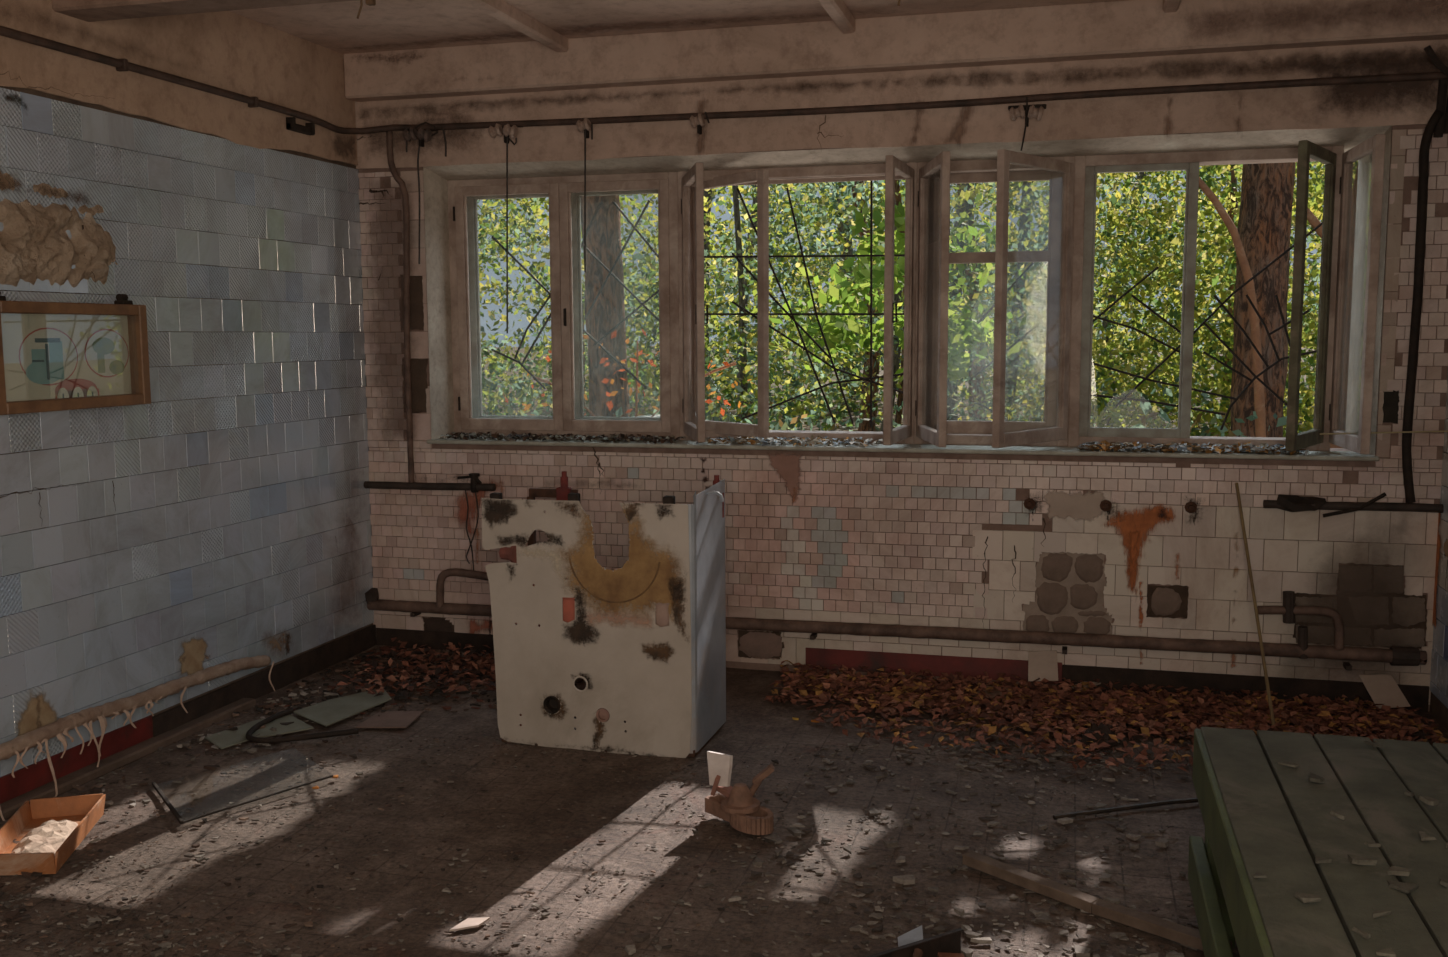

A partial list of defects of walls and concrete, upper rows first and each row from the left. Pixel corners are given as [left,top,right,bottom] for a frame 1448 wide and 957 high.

spalling [0,171,118,288]
peeling [179,638,209,675]
spalling [1023,552,1113,635]
corrosion [1107,505,1174,626]
spalling [1293,593,1331,644]
spalling [1370,565,1427,648]
peeling [18,694,57,736]